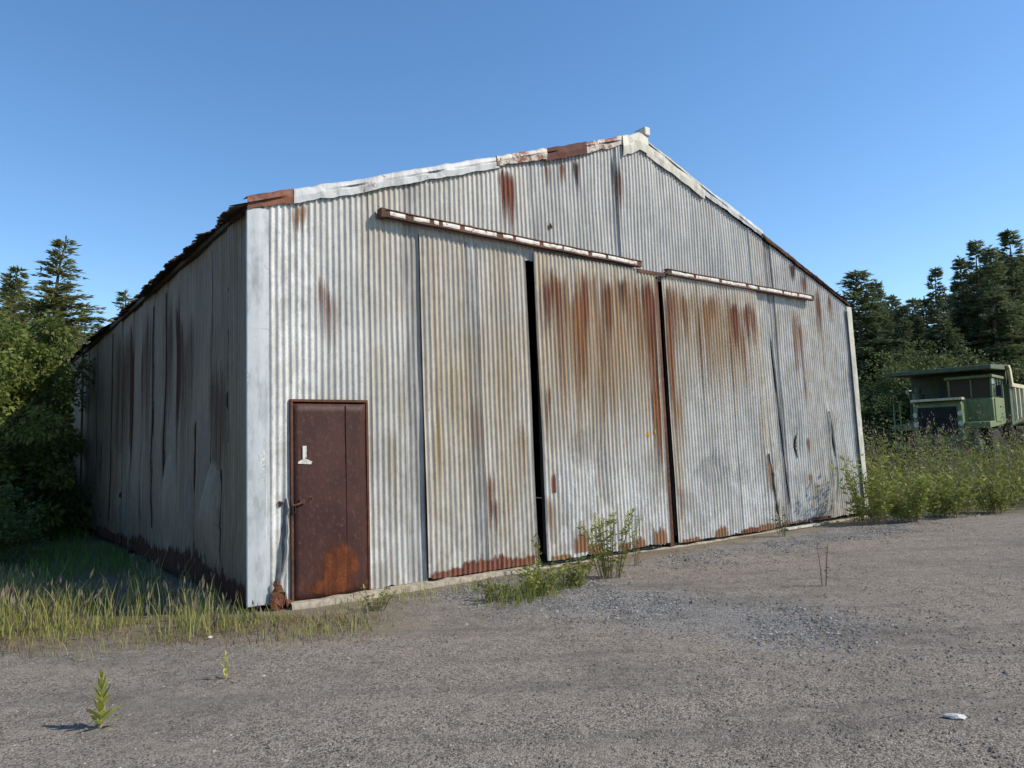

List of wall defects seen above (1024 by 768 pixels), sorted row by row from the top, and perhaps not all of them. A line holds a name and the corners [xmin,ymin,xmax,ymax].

corrosion [499,170,515,233]
corrosion [540,271,759,471]
corrosion [792,313,807,396]
corrosion [312,543,358,594]
corrosion [432,553,536,579]
corrosion [548,461,599,537]
corrosion [552,533,601,560]
corrosion [621,480,667,550]
corrosion [716,526,728,538]
corrosion [741,515,831,534]